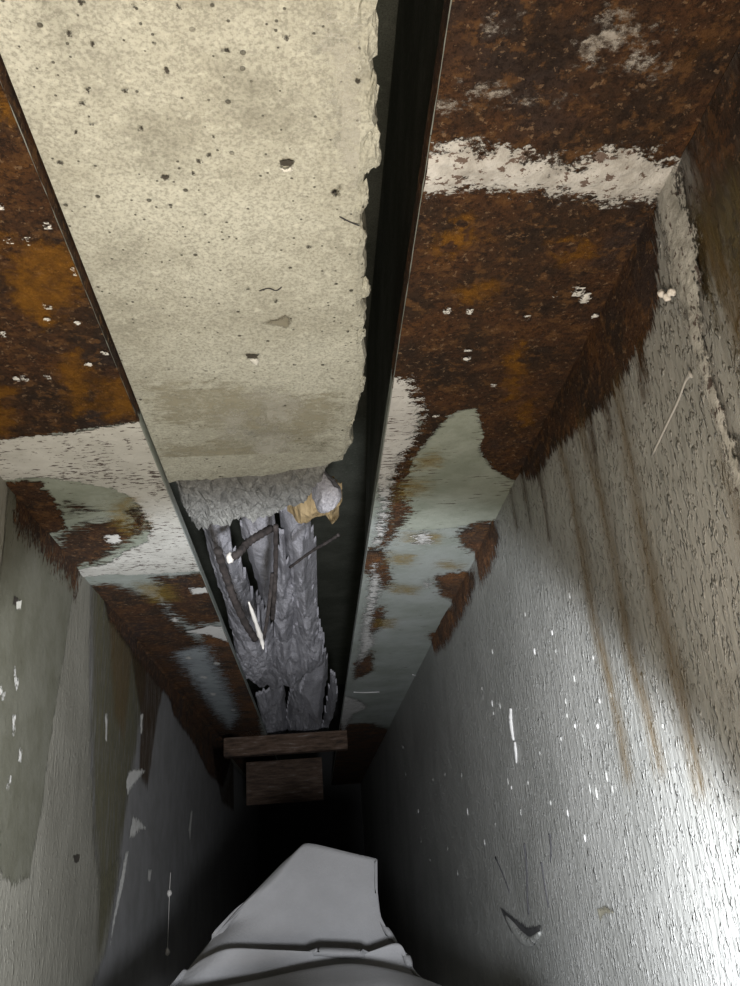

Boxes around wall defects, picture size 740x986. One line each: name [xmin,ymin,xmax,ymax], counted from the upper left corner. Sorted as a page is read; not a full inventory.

corrosion [0,54,140,441]
corrosion [392,0,740,540]
peeling [0,422,340,889]
corrosion [104,600,276,809]
corrosion [426,517,498,653]